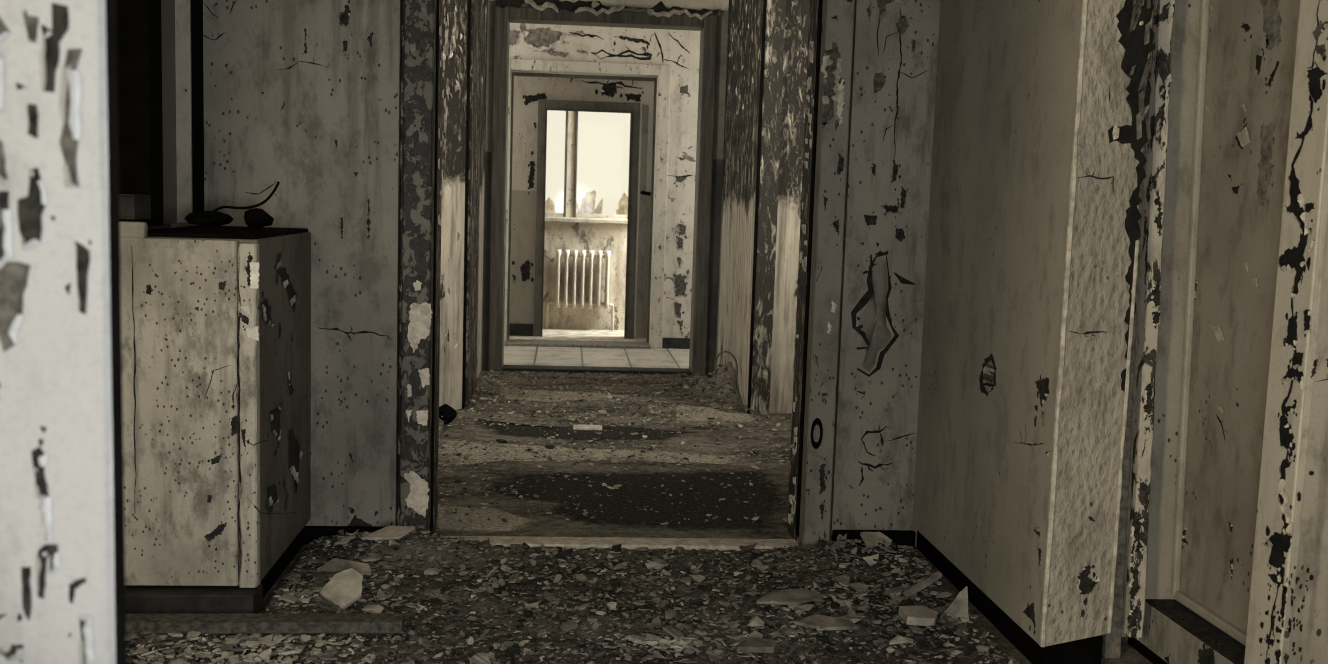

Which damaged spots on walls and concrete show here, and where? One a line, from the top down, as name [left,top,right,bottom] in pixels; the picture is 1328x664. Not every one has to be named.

peeling [0,3,82,188]
peeling [483,0,760,114]
peeling [867,0,916,54]
spalling [1295,21,1328,139]
peeling [0,141,55,351]
peeling [65,240,92,314]
spalling [1108,0,1164,392]
peeling [1228,104,1276,211]
peeling [1143,383,1153,422]
peeling [1259,167,1328,664]
peeling [1128,517,1145,632]
peeling [1197,639,1220,664]